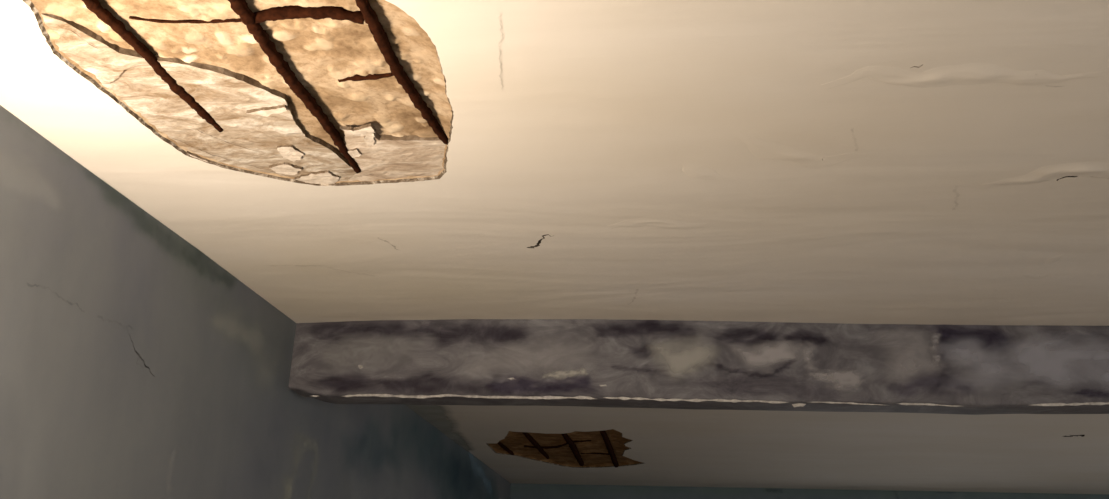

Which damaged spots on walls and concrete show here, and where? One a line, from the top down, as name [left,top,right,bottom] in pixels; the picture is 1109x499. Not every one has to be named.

spalling [23,0,454,186]
spalling [485,429,644,468]